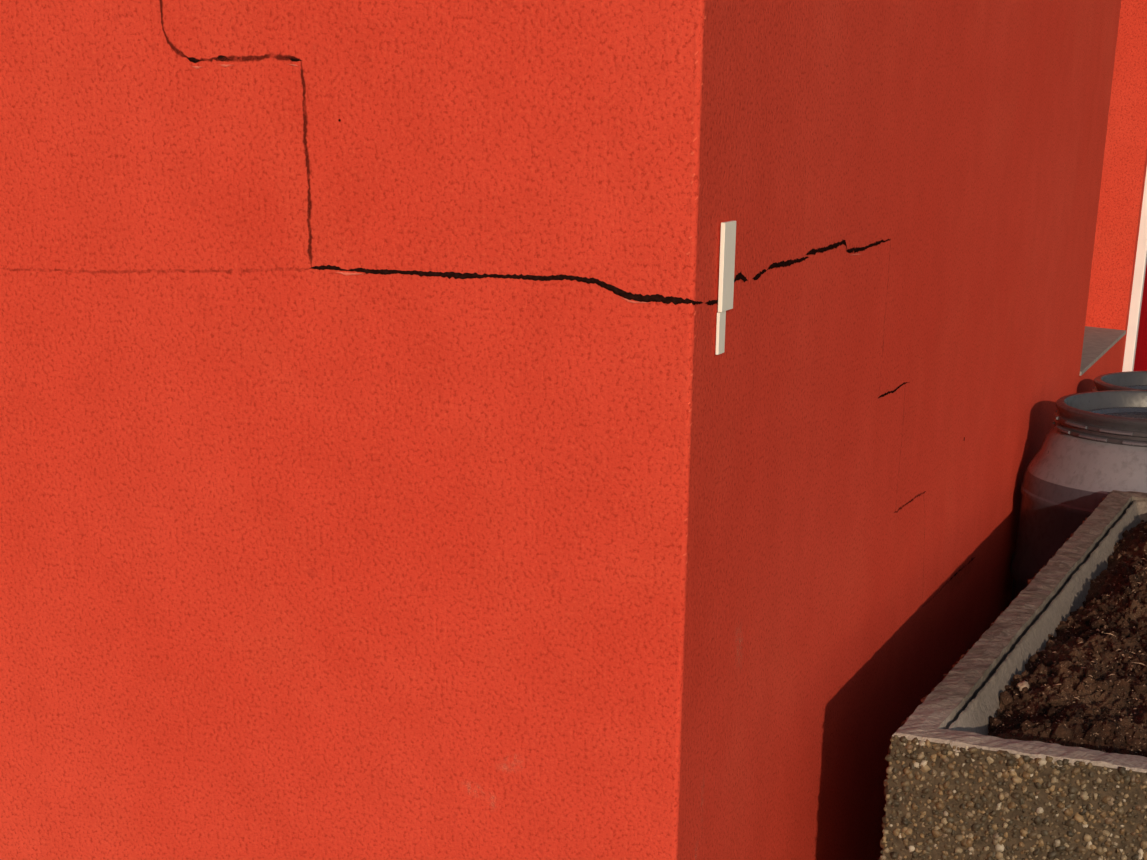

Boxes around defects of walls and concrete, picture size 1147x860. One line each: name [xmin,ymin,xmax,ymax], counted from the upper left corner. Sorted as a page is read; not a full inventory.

crack [160,0,890,305]
crack [878,382,909,398]